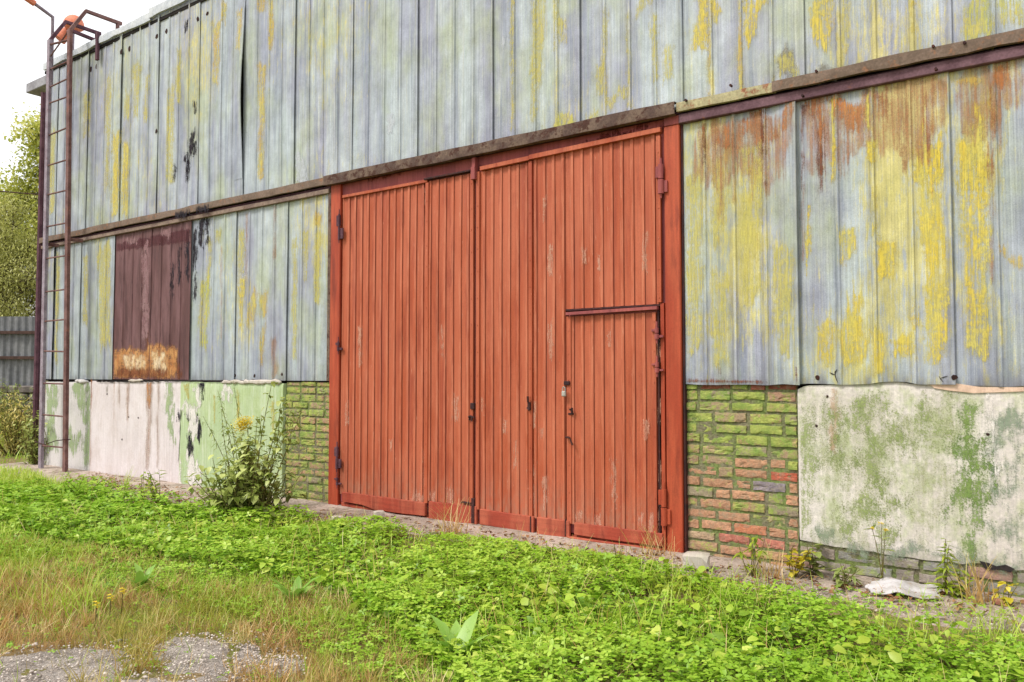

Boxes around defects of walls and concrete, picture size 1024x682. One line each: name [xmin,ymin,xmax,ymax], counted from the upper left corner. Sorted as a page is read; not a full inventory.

rust [694,60,1023,205]
peeling [46,383,90,467]
rust [114,336,182,407]
peeling [161,383,202,486]
peeling [219,384,234,409]
damp [815,525,834,543]